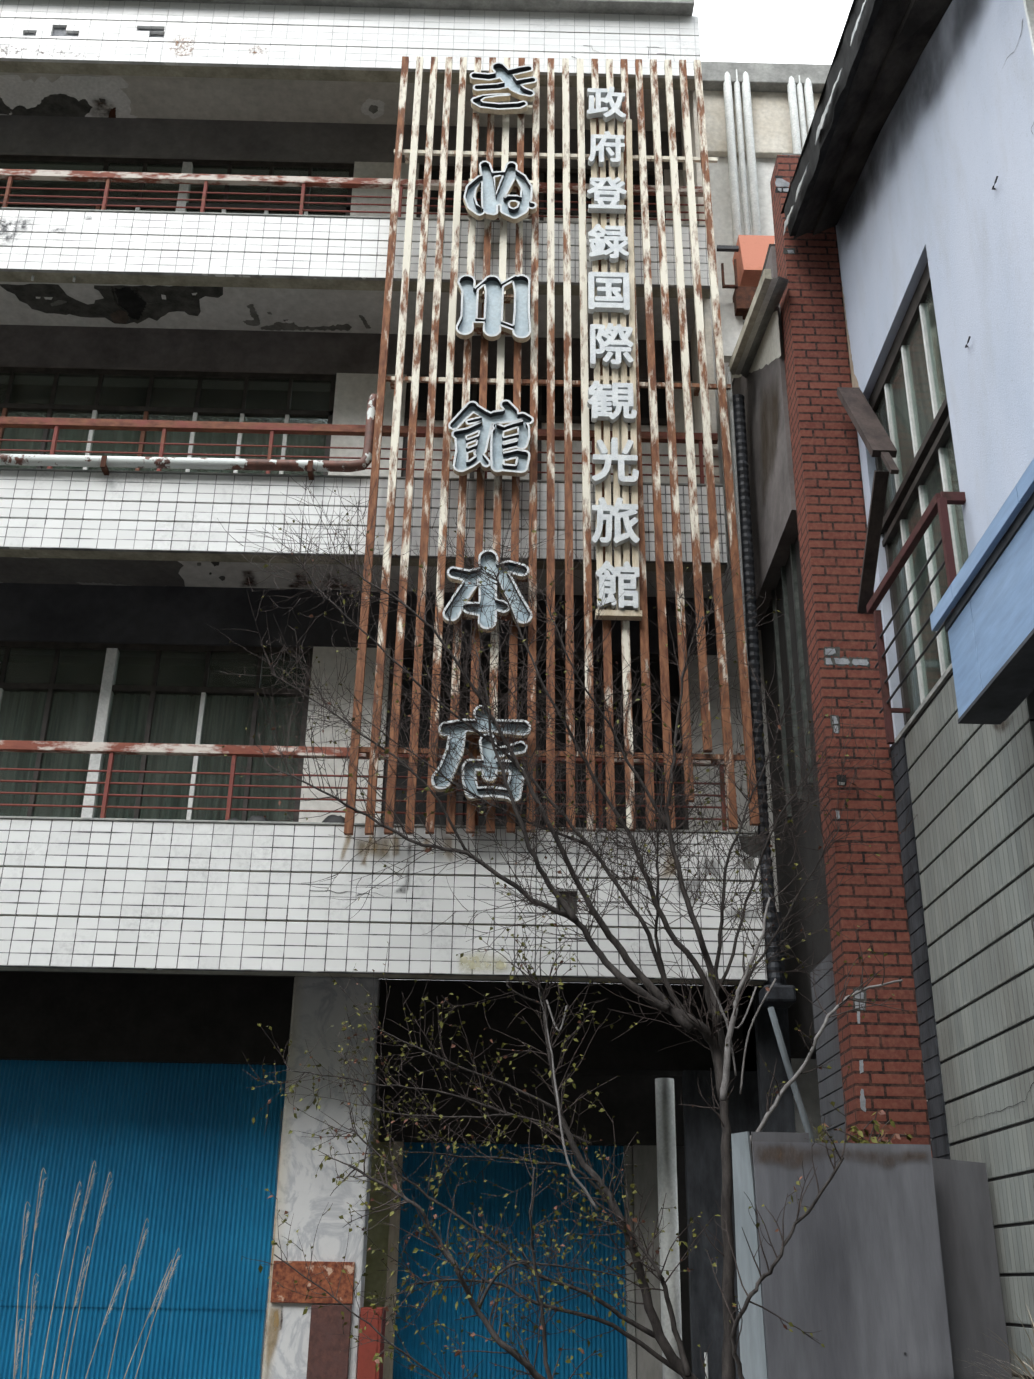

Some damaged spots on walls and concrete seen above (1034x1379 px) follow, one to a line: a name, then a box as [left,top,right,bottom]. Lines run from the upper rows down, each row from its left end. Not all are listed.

peeling [0,74,138,118]
spalling [0,284,223,325]
rust [262,1309,282,1362]